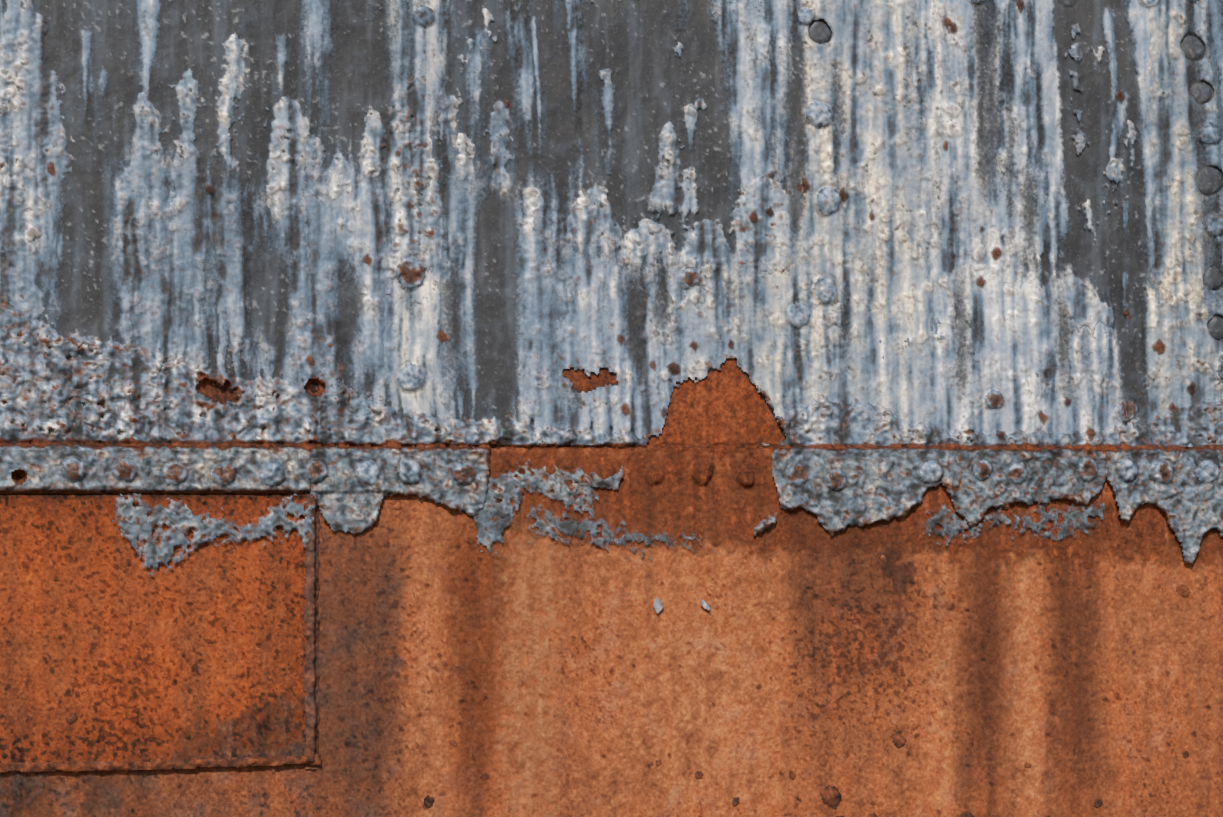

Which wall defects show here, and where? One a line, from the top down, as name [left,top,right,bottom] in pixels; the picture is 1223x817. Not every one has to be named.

peeling [0,0,1223,575]
corrosion [0,339,1223,810]
corrosion [820,785,844,817]